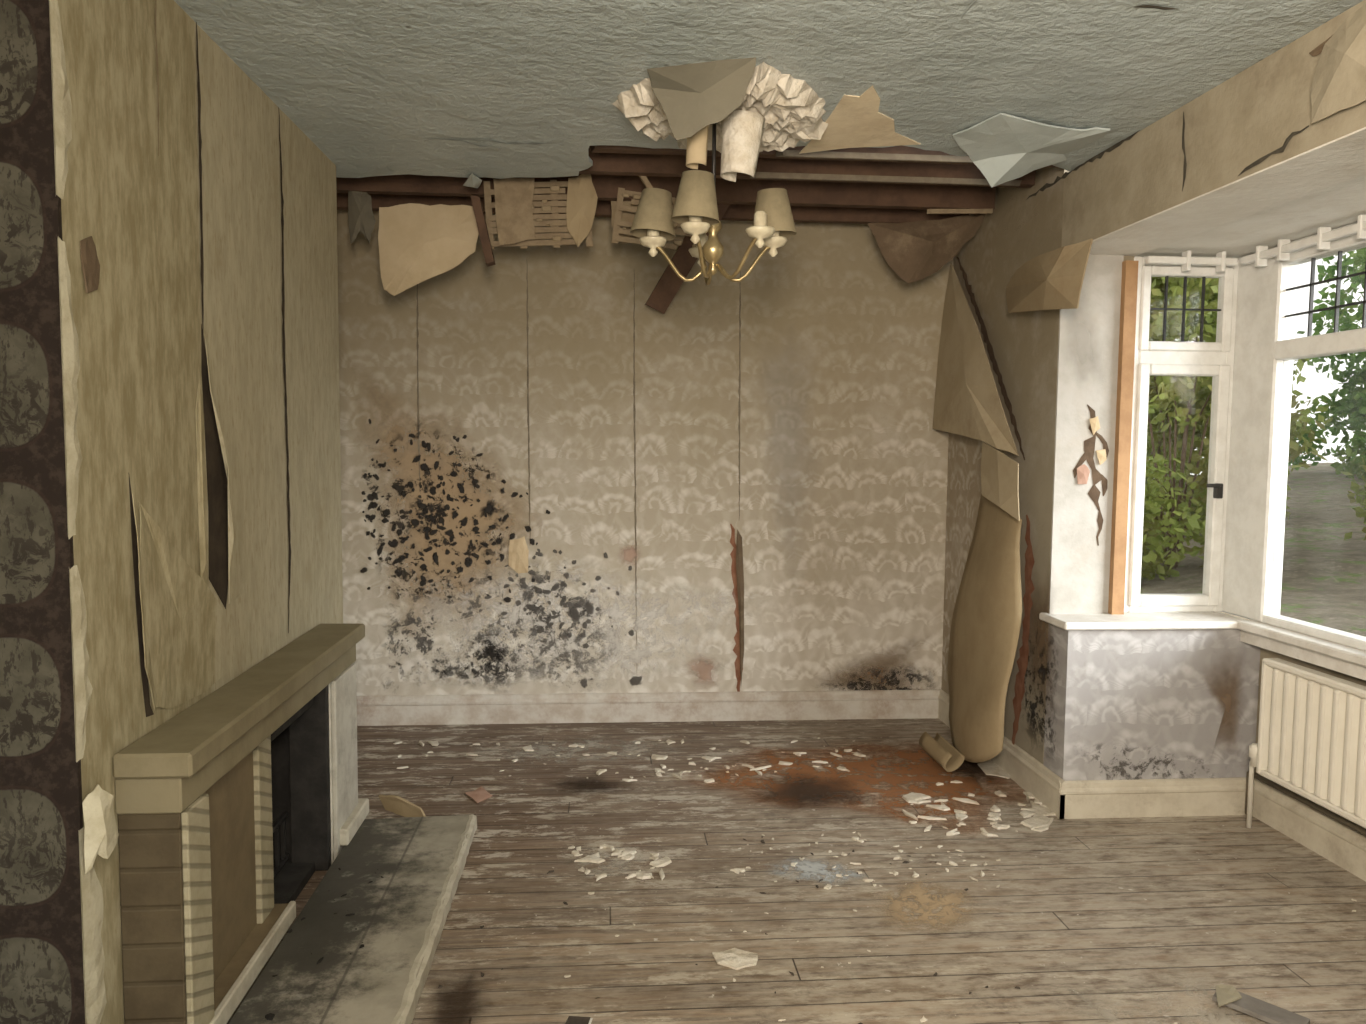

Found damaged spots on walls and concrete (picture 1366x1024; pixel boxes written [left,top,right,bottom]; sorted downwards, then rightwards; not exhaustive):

peeling [799,85,921,154]
leakage [360,424,669,688]
leakage [1213,676,1237,736]
leakage [1093,749,1183,780]